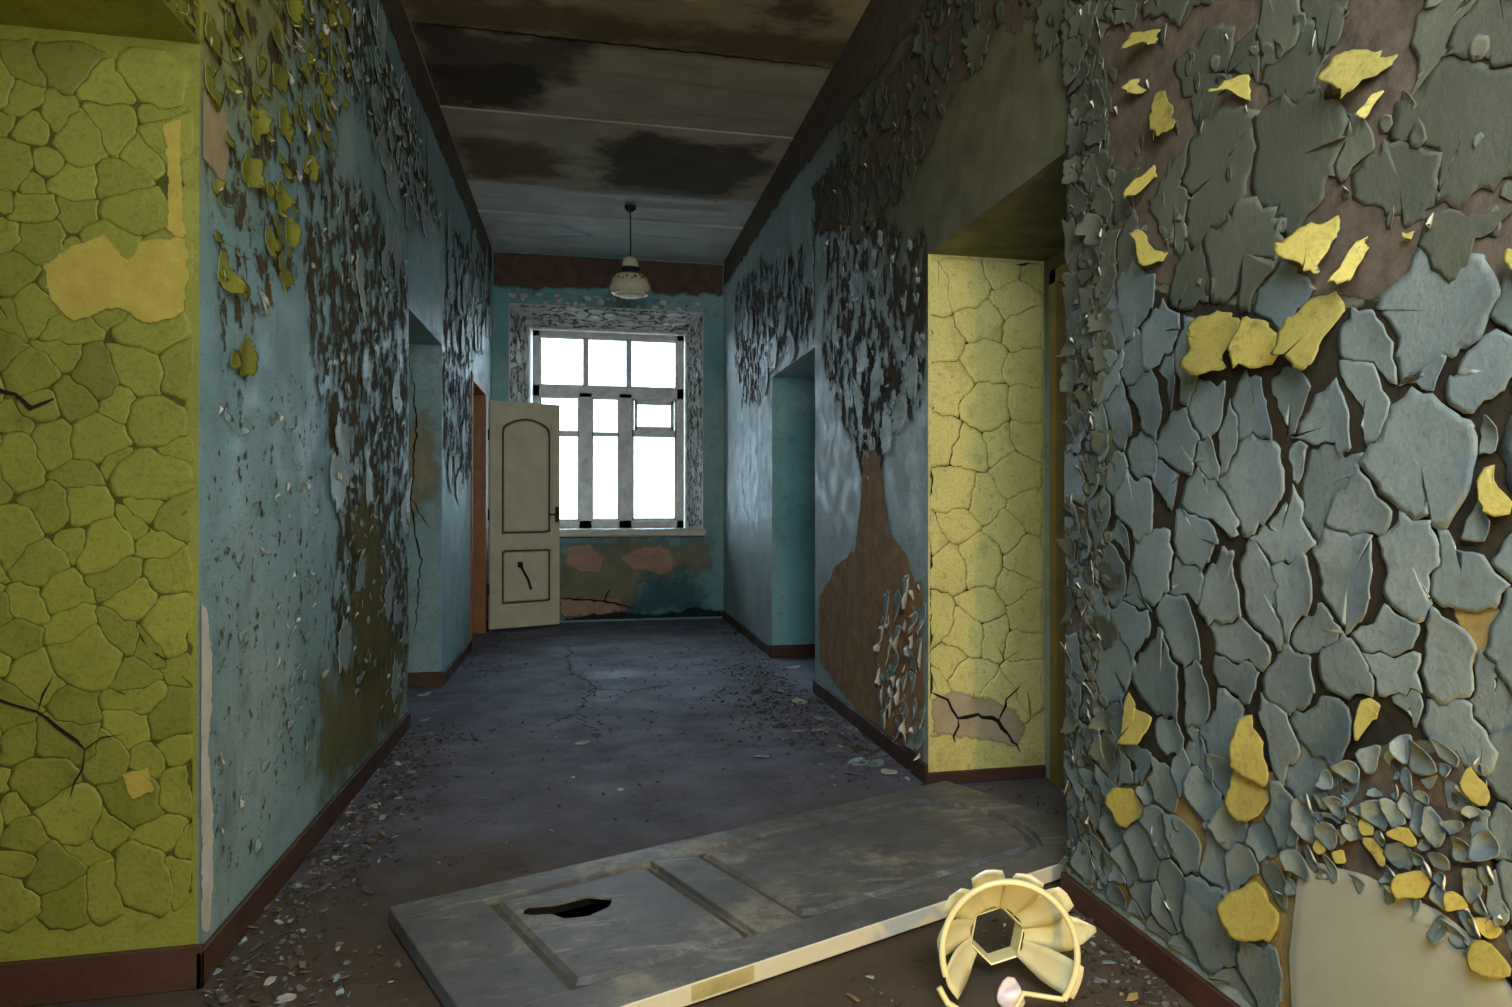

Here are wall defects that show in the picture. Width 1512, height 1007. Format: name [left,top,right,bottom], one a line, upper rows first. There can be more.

water stain [408,0,846,109]
water stain [460,132,773,216]
crack [0,389,54,410]
peeling [0,0,702,934]
flaking render [723,0,1512,1007]
crack [0,679,118,797]